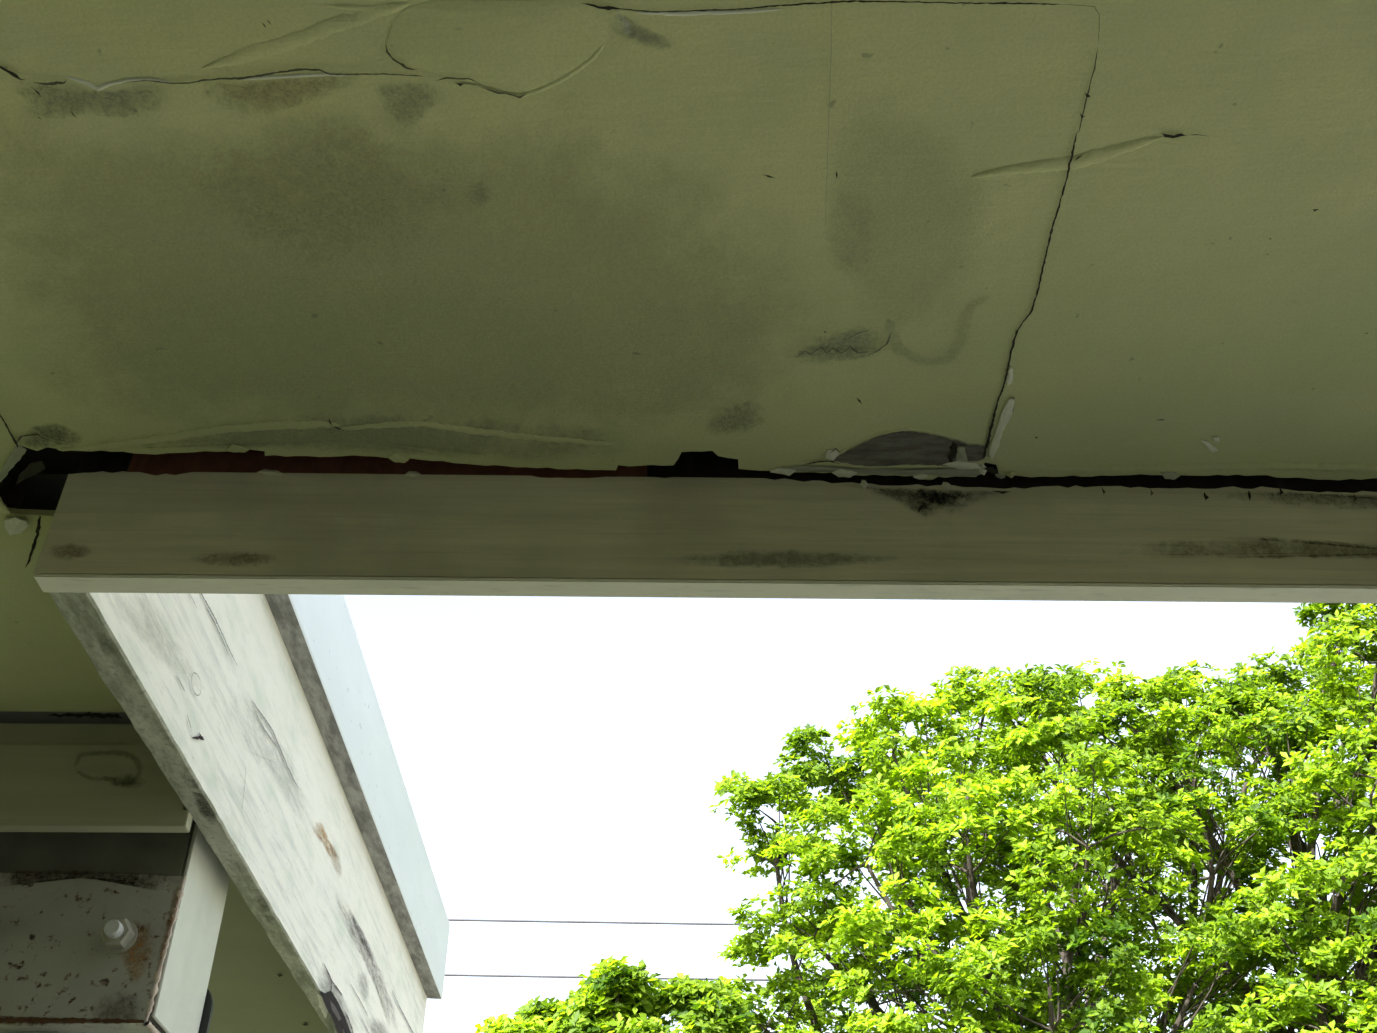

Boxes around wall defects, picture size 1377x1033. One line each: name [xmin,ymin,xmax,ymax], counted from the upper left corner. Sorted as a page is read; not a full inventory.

crack [0,66,425,119]
crack [582,0,1100,460]
crack [0,415,18,448]
corrosion [11,871,154,889]